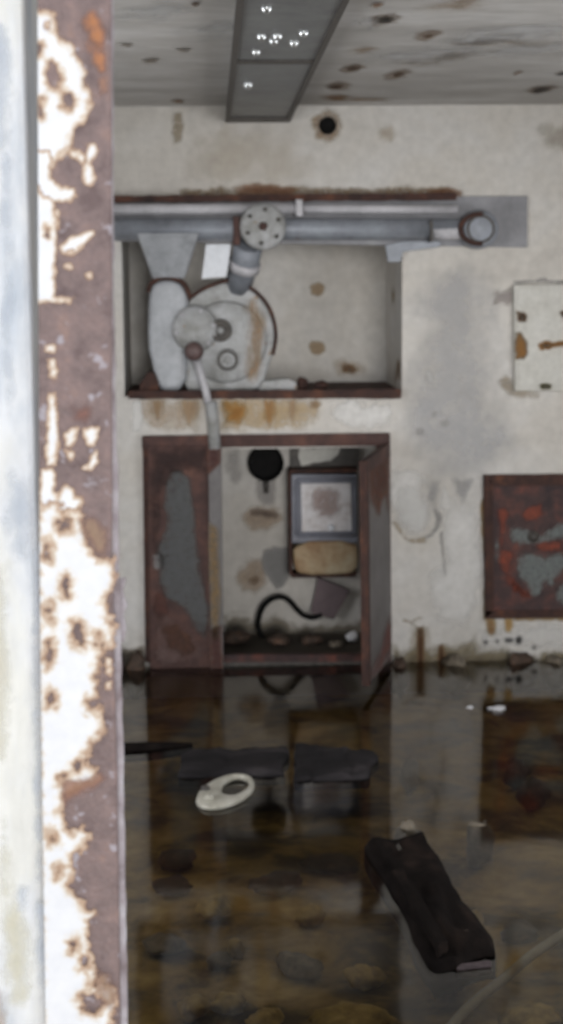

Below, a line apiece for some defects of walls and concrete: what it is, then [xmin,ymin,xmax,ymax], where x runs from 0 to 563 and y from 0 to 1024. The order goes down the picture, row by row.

rust [84,12,106,89]
peeling [38,9,99,305]
rust [182,183,461,196]
rust [220,399,321,429]
peeling [39,344,120,1024]